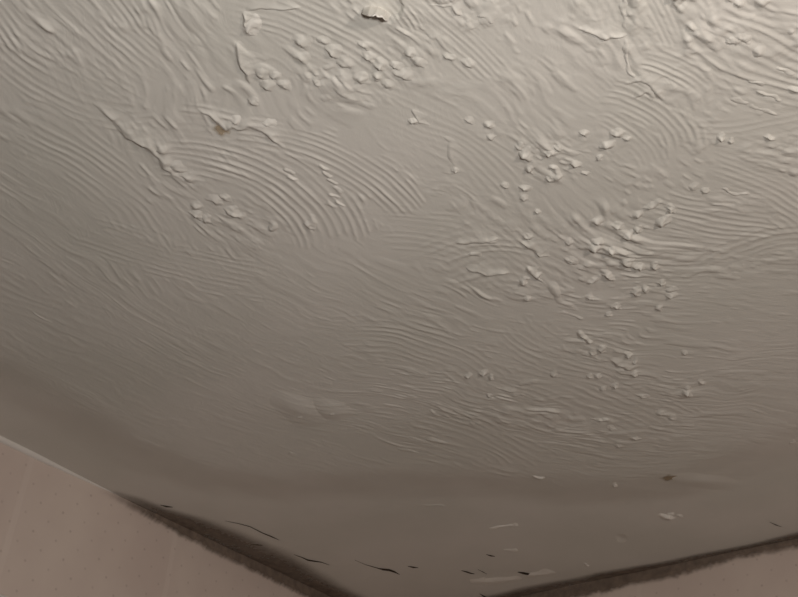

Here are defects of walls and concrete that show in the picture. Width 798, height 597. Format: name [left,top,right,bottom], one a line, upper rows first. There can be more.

mould [133,502,354,597]
crack [355,560,417,575]
mould [496,534,798,597]